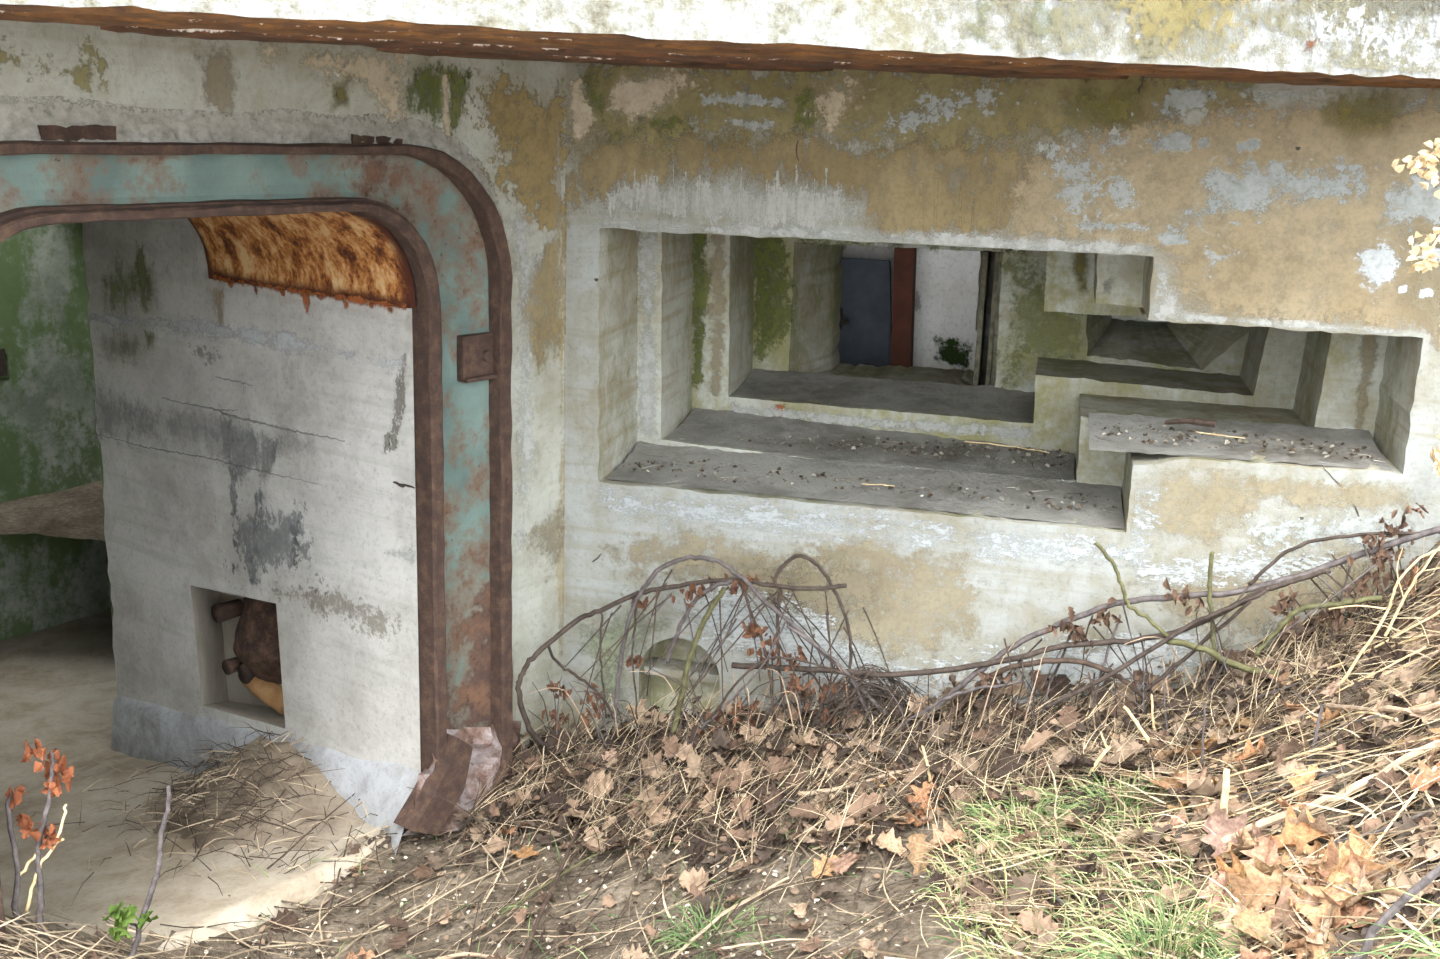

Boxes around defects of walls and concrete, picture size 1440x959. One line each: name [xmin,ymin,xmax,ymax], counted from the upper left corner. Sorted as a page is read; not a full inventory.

leakage [131,19,234,33]
leakage [296,26,512,121]
leakage [88,247,402,369]
rust [212,274,406,324]
leakage [442,38,1440,439]
peeling [1037,86,1440,299]